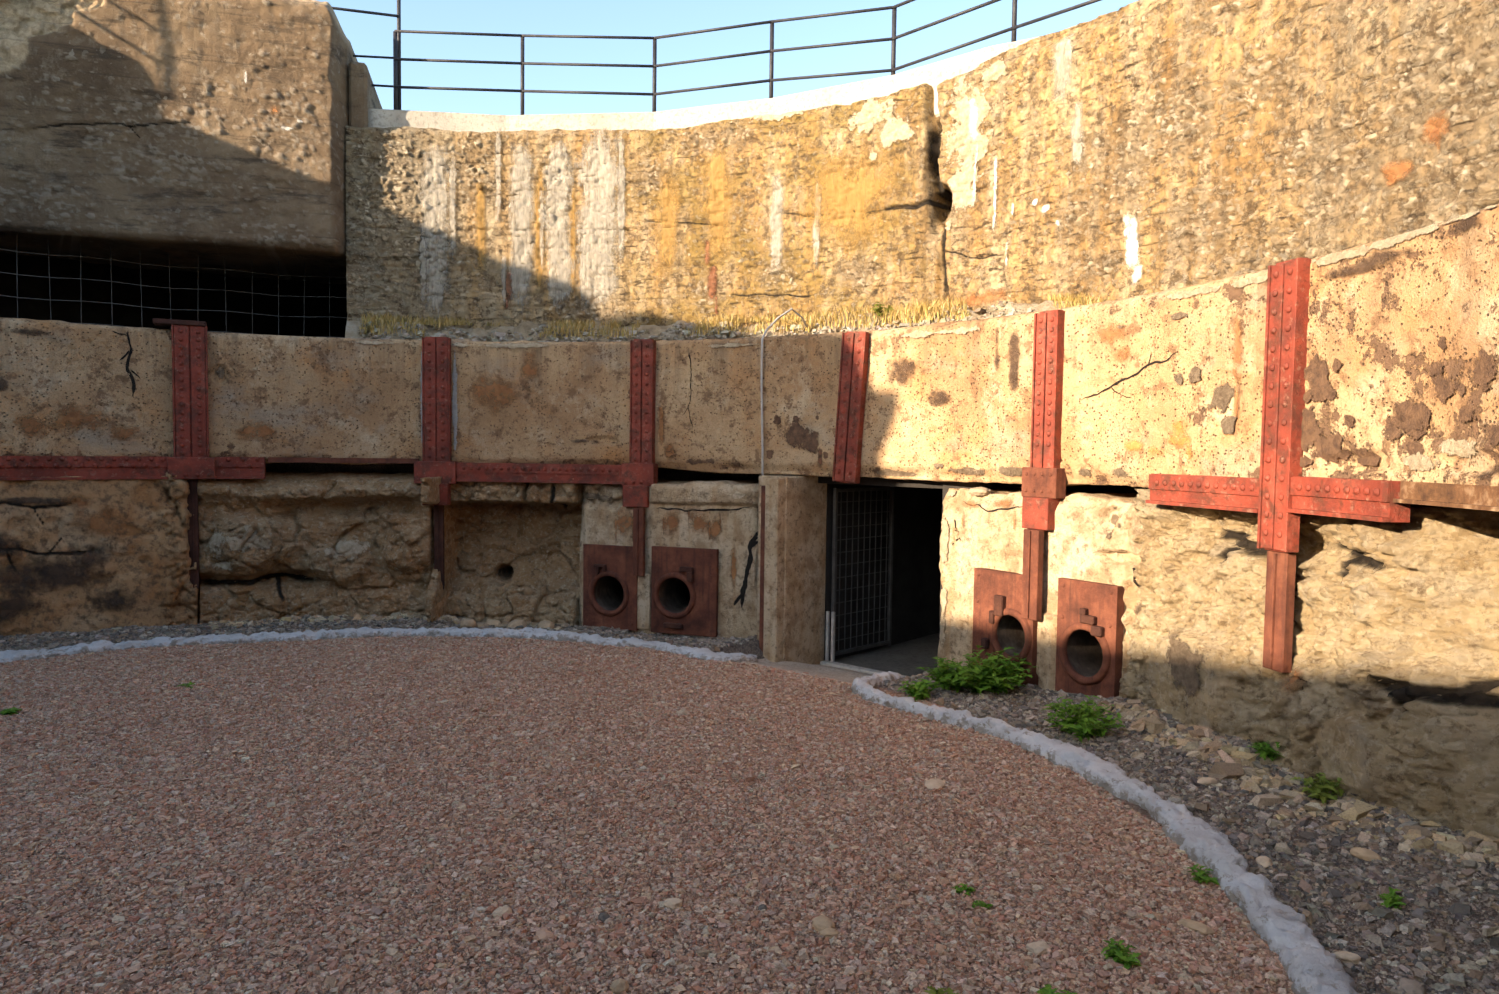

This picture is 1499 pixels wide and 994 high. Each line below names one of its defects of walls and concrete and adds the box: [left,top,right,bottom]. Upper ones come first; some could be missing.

damp [418,148,457,313]
damp [476,130,625,306]
crack [865,124,1001,302]
corrosion [505,271,514,309]
corrosion [18,406,138,440]
corrosion [237,424,419,463]
crack [1081,351,1179,400]
corrosion [1233,320,1242,416]